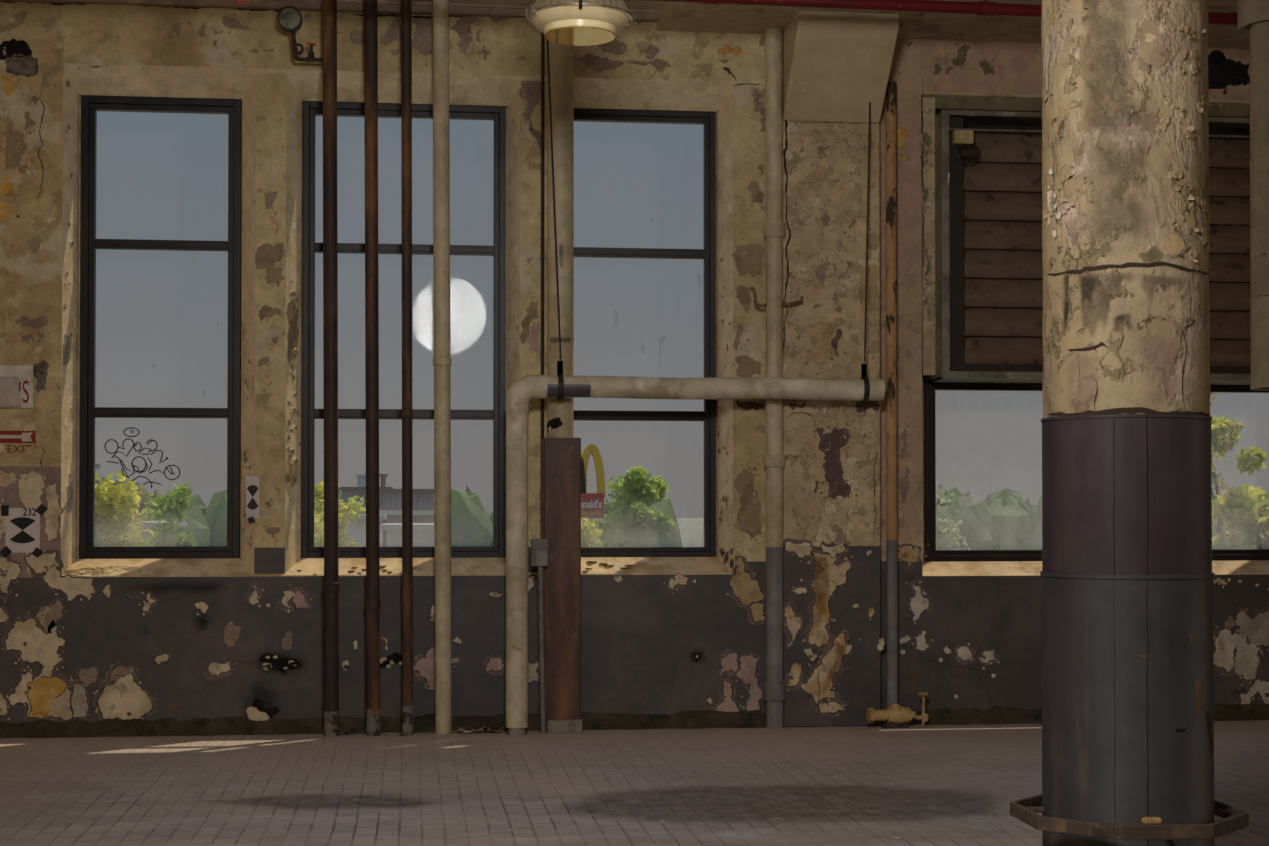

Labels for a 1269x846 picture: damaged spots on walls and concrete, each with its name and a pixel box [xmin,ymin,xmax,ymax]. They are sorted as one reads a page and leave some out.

spalling [0,7,39,77]
spalling [1125,23,1250,140]
crack [1047,262,1210,276]
peeling [0,314,73,394]
peeling [813,423,860,504]
peeling [0,456,159,722]
spalling [246,699,280,721]
peeling [244,580,315,613]
peeling [706,649,763,712]
peeling [783,524,876,718]
peeling [876,544,999,679]
peeling [1213,607,1269,704]